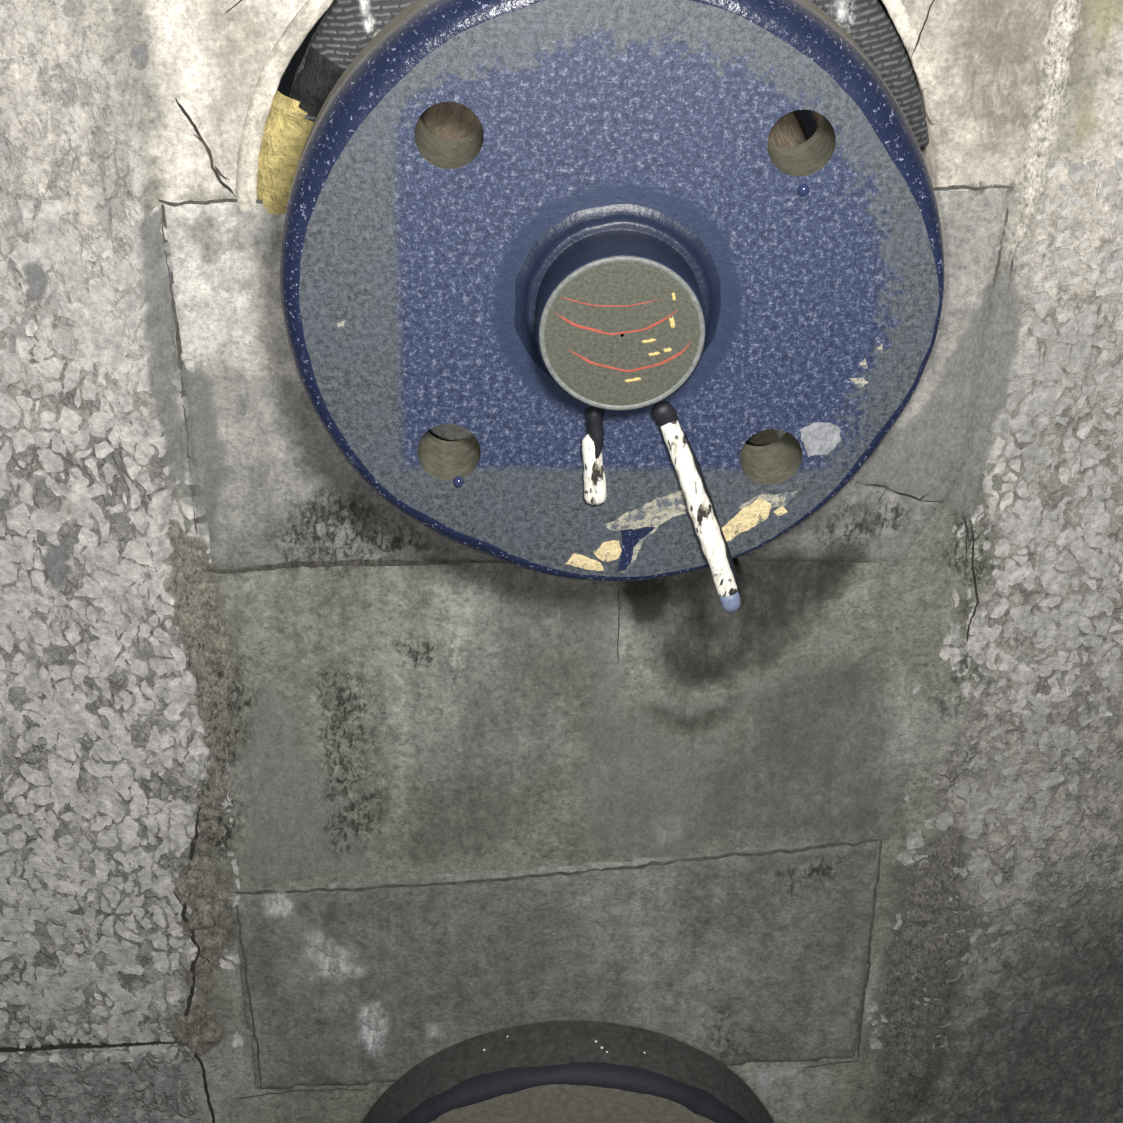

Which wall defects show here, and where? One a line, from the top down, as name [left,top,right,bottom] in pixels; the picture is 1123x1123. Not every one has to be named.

crack [911,0,935,58]
crack [175,97,236,197]
crack [1010,209,1024,274]
peeling [566,490,689,573]
peeling [722,491,798,541]
crack [857,482,979,648]
damp [626,560,832,679]